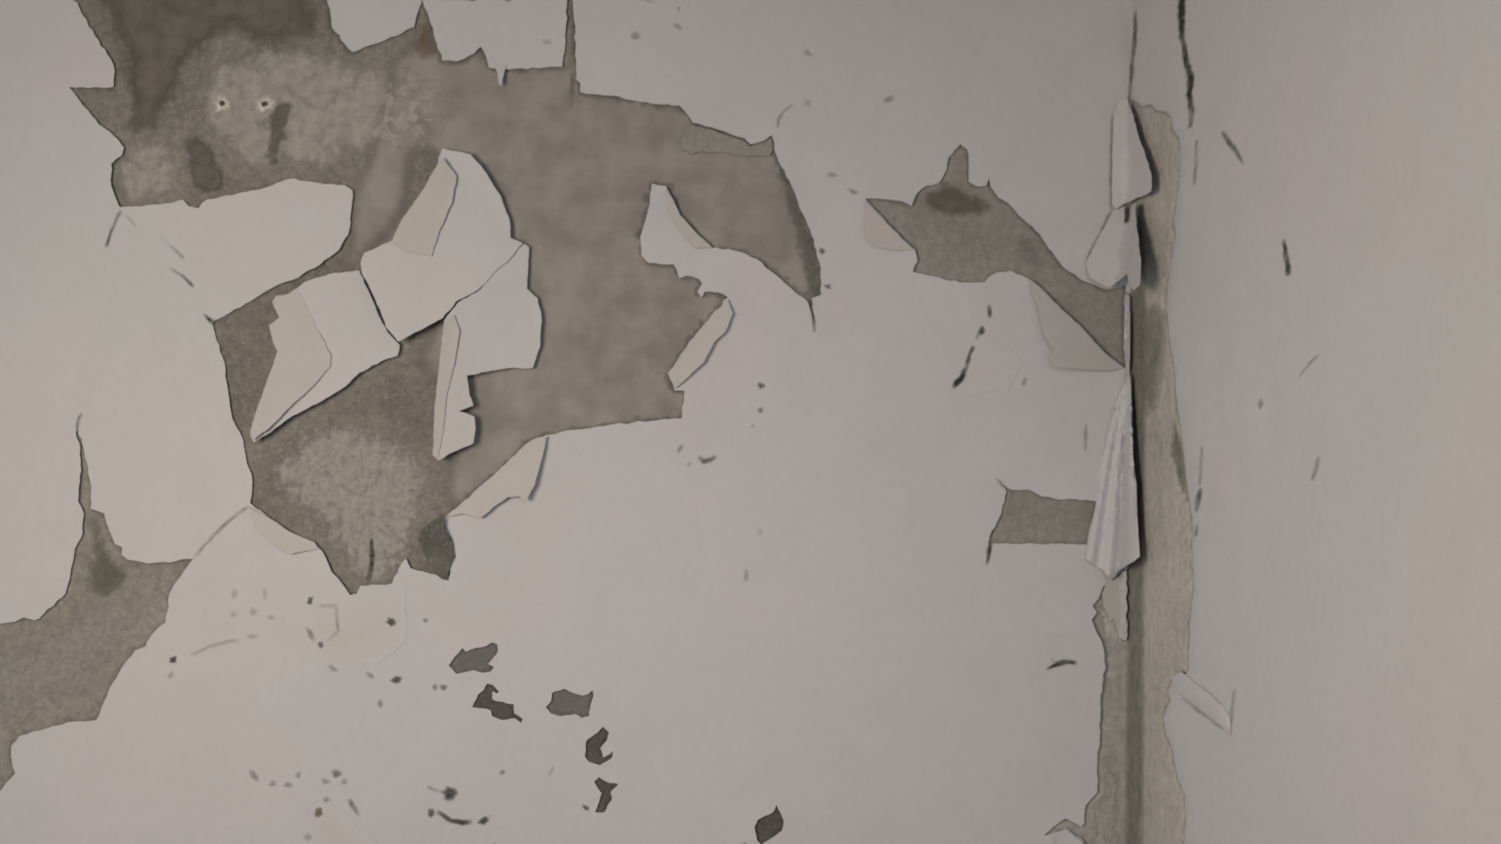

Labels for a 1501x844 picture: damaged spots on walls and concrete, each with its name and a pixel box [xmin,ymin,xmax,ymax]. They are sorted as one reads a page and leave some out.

peeling [0,430,192,791]
peeling [70,0,821,595]
peeling [449,643,523,722]
peeling [546,689,618,813]
peeling [755,806,784,844]
peeling [865,99,1194,844]